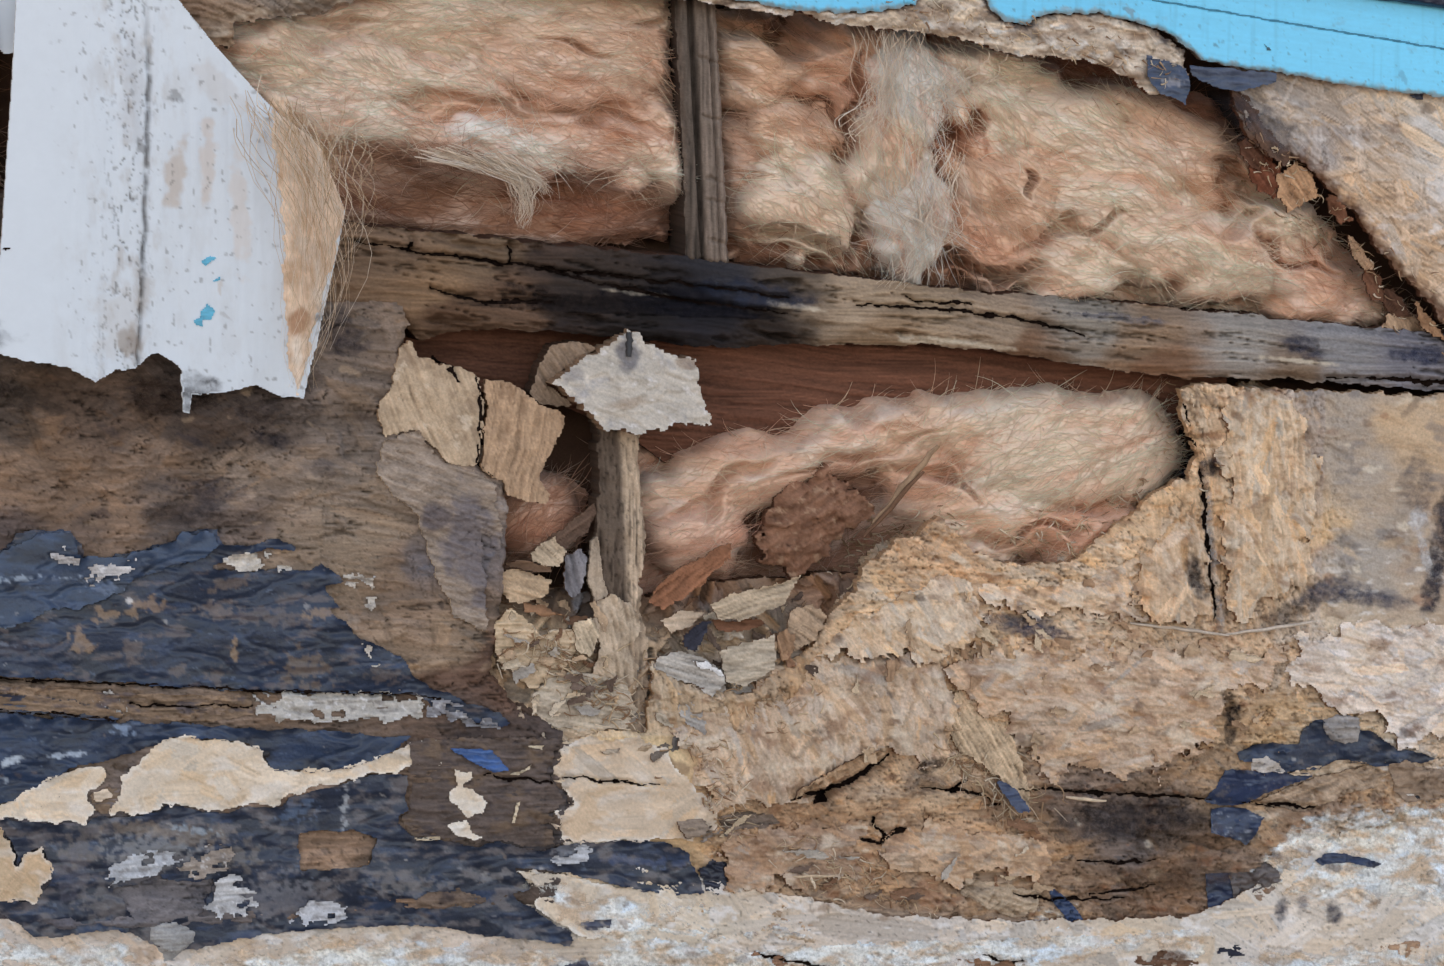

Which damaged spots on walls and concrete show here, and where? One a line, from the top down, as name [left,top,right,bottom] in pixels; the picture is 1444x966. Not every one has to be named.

spalling [697,0,1444,341]
peeling [194,304,215,327]
peeling [50,546,137,586]
crack [1175,403,1217,621]
peeling [206,340,1444,966]
peeling [0,935,154,966]
peeling [104,844,259,920]
peeling [0,734,420,905]